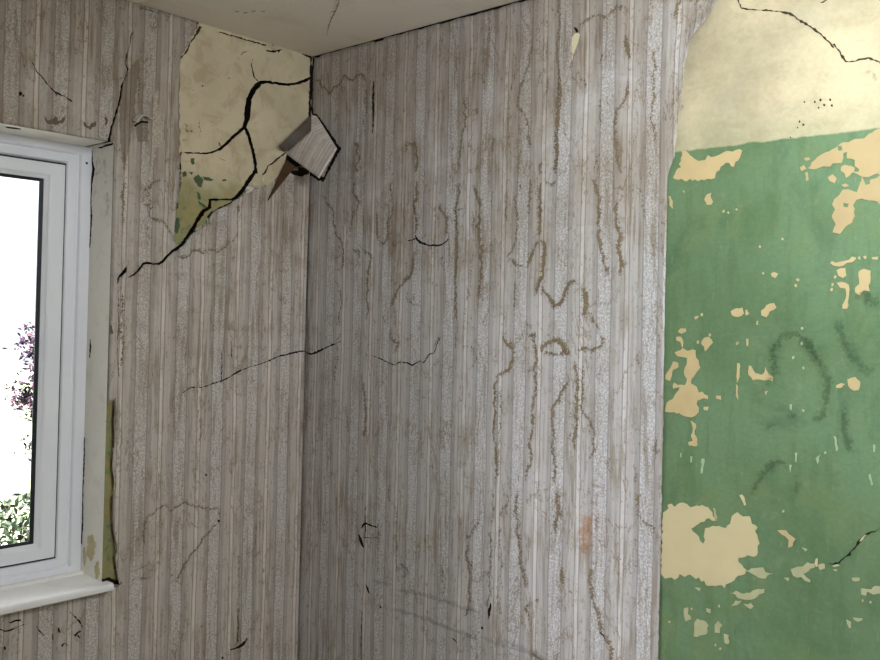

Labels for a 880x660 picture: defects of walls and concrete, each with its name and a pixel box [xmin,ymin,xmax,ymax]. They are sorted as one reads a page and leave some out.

crack [738,0,880,63]
flaking render [173,23,310,244]
crack [111,0,527,377]
damp [433,184,493,319]
damp [492,0,605,586]
damp [593,180,626,274]
peeling [800,129,880,234]
crack [183,341,341,393]
peeling [665,328,721,446]
peeling [660,495,773,609]
crack [815,528,880,567]
damp [587,569,615,660]